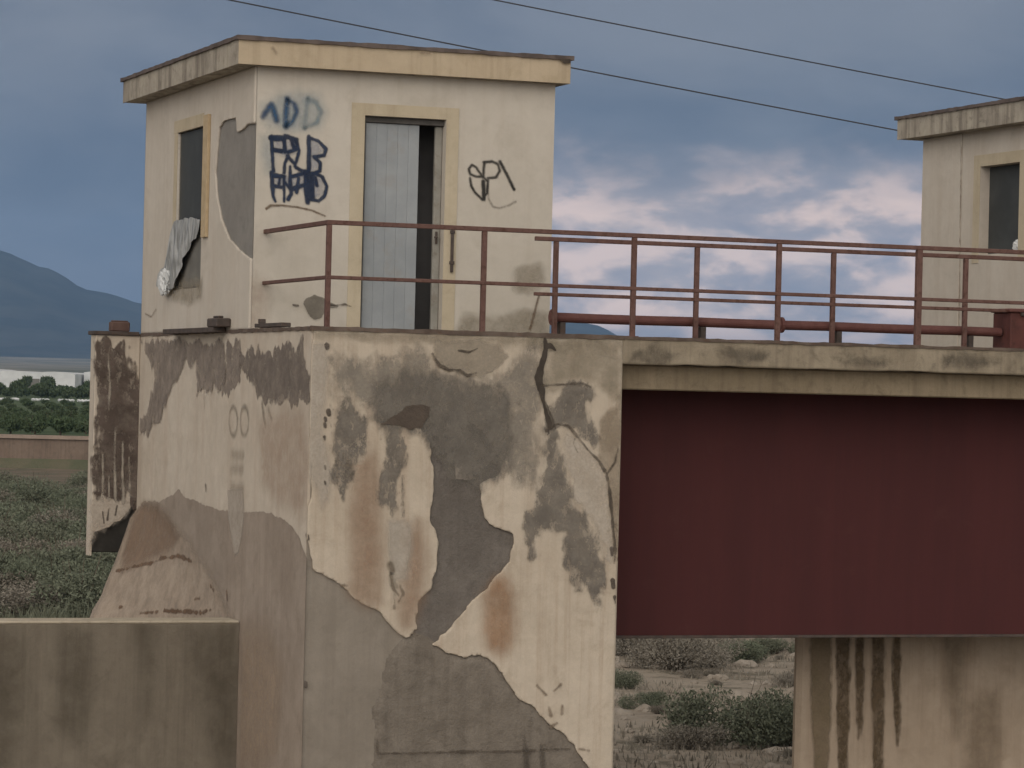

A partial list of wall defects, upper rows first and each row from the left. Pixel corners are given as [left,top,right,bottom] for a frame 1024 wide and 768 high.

peeling [217,118,256,259]
spalling [293,295,347,319]
damp [90,336,140,512]
damp [330,312,540,582]
crack [534,338,618,560]
peeling [90,380,616,768]
damp [811,637,901,768]